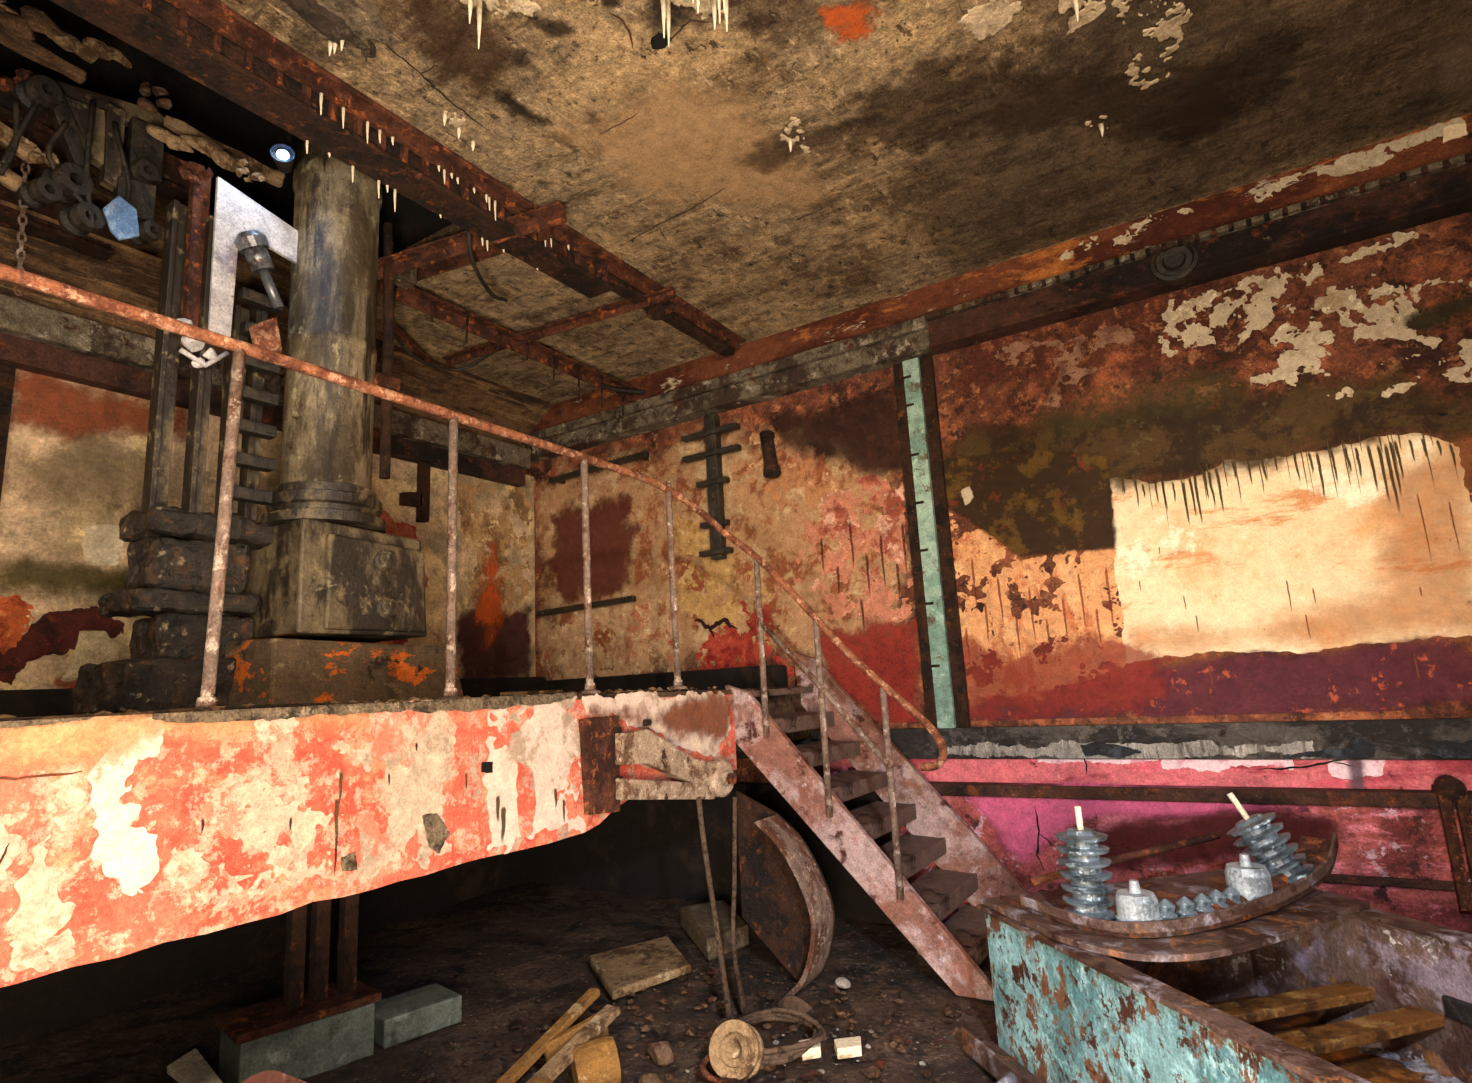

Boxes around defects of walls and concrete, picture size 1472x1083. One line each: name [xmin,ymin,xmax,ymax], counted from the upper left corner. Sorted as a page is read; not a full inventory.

damp [651,0,729,47]
corrosion [819,4,872,39]
damp [406,0,574,151]
peeling [1254,118,1468,203]
peeling [1158,231,1472,387]
peeling [1327,386,1354,400]
peeling [1381,376,1420,398]
damp [944,371,1472,555]
peeling [0,510,796,972]